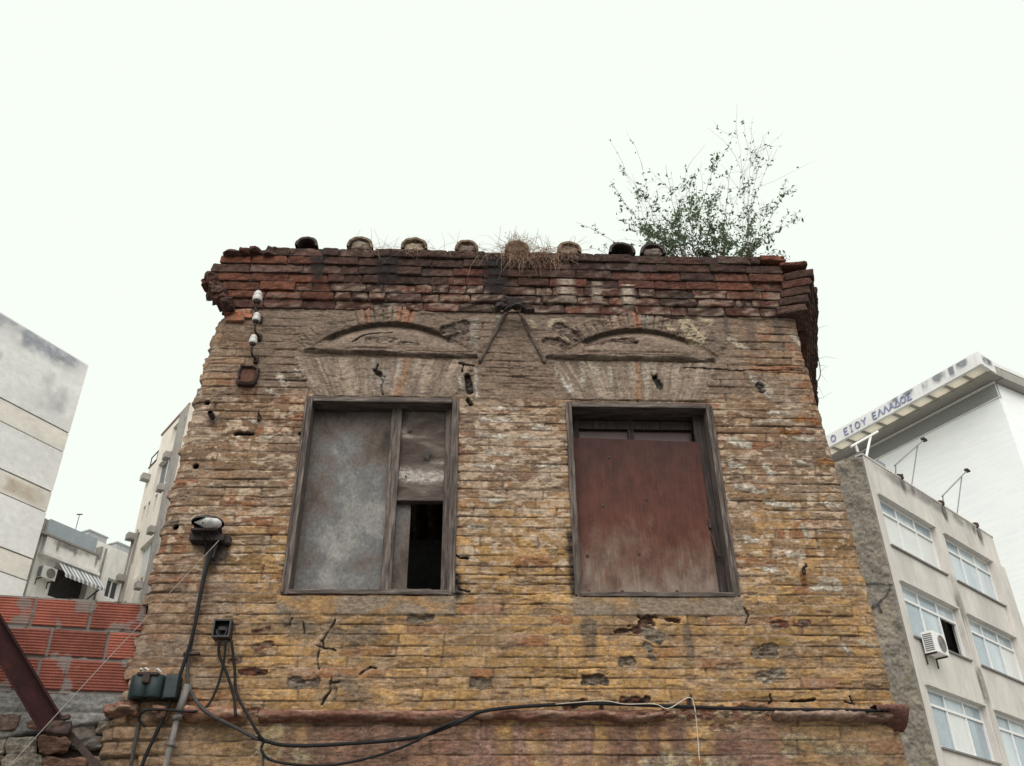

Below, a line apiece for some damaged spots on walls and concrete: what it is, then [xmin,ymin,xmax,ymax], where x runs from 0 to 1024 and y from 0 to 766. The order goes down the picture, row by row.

spalling [614,616,680,662]
crack [286,619,376,705]
spalling [619,656,636,666]
spalling [470,677,493,690]
spalling [581,674,609,686]